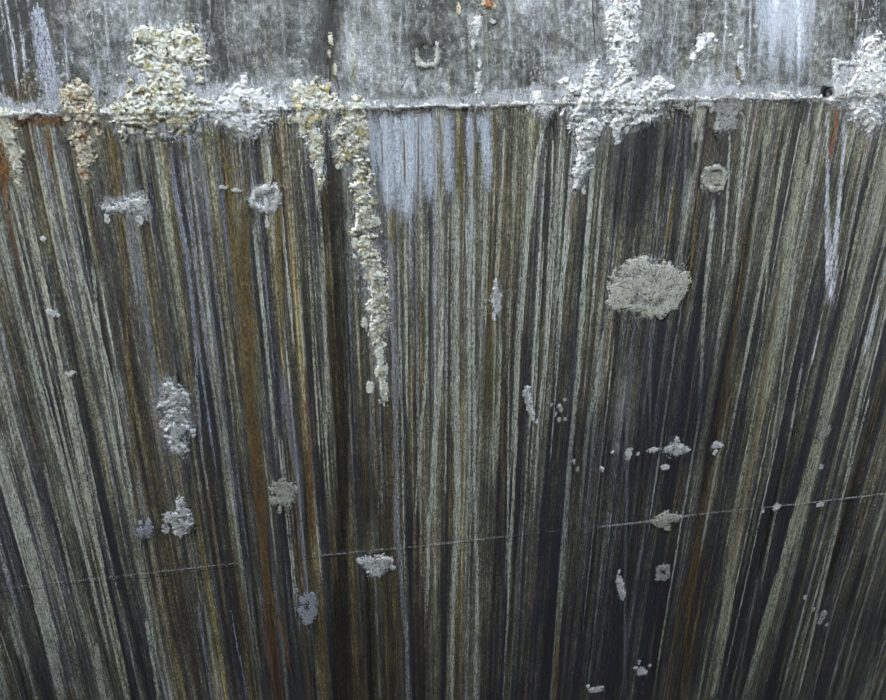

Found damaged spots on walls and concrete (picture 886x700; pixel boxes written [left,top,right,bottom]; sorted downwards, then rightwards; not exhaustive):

corrosion [0,141,20,274]
water stain [0,382,77,700]
corrosion [9,111,103,181]
water stain [34,150,81,345]
water stain [62,150,147,553]
water stain [99,130,243,544]
water stain [415,115,516,700]
water stain [506,130,547,613]
water stain [695,124,769,557]
water stain [711,120,823,698]
water stain [800,380,886,687]
water stain [830,231,886,484]